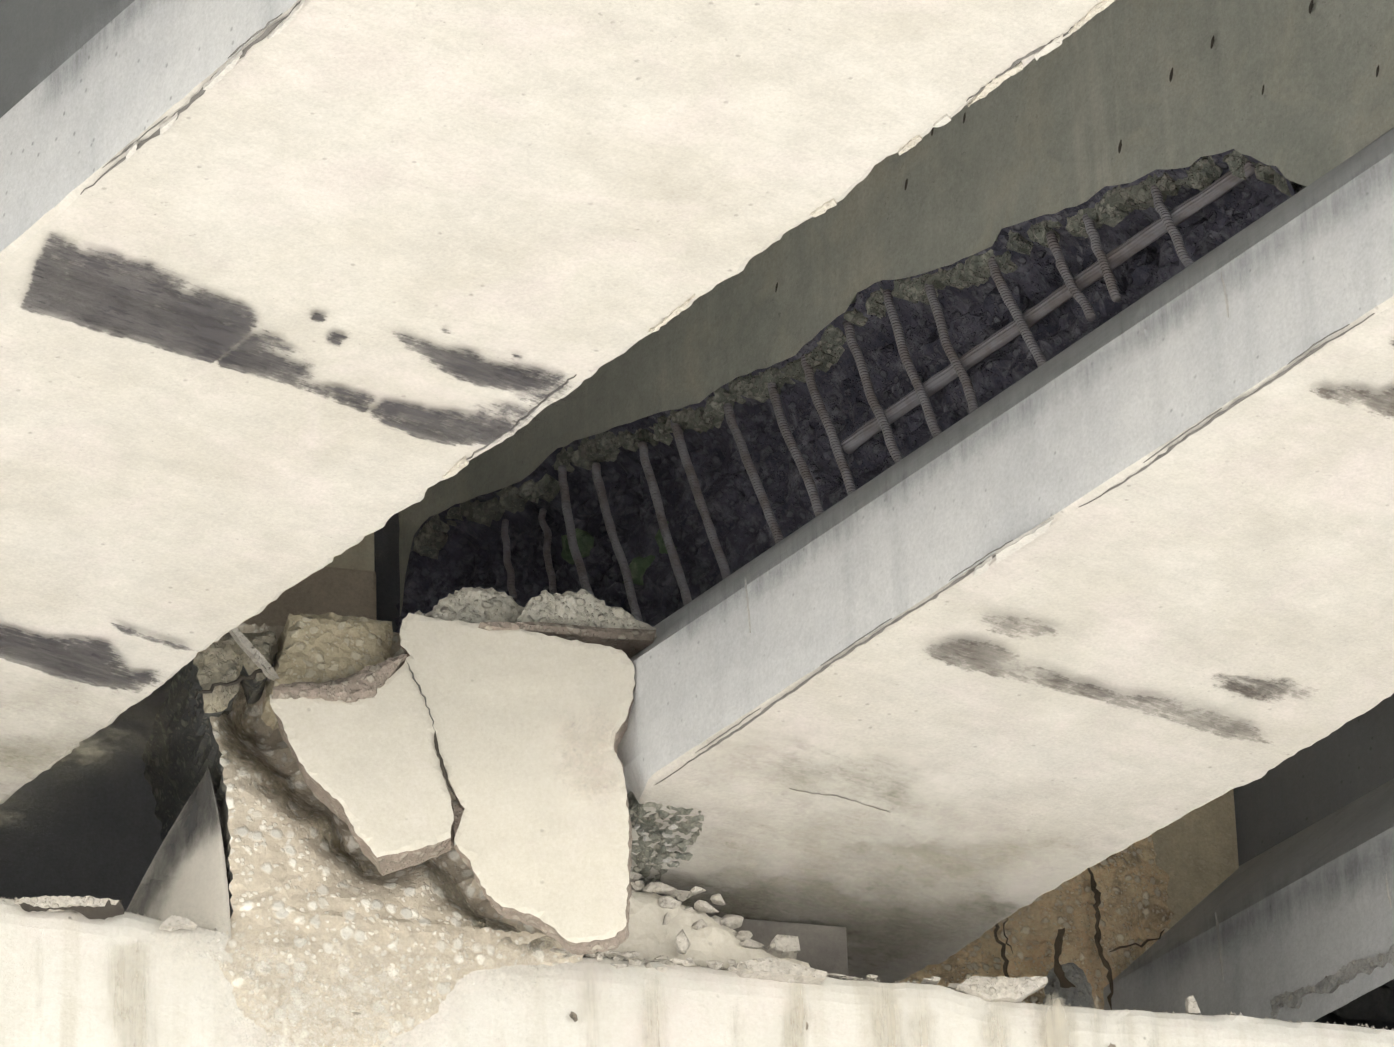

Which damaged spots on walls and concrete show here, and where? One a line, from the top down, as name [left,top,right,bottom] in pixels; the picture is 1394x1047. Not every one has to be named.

spalling [898,0,1115,155]
spalling [393,149,1306,659]
leakage [1311,386,1394,417]
leakage [930,617,1268,743]
leakage [1219,675,1288,701]
spalling [627,791,704,887]
peeling [736,957,827,985]
crack [994,917,1013,978]
crack [1087,868,1165,1010]
spalling [1270,944,1394,1030]